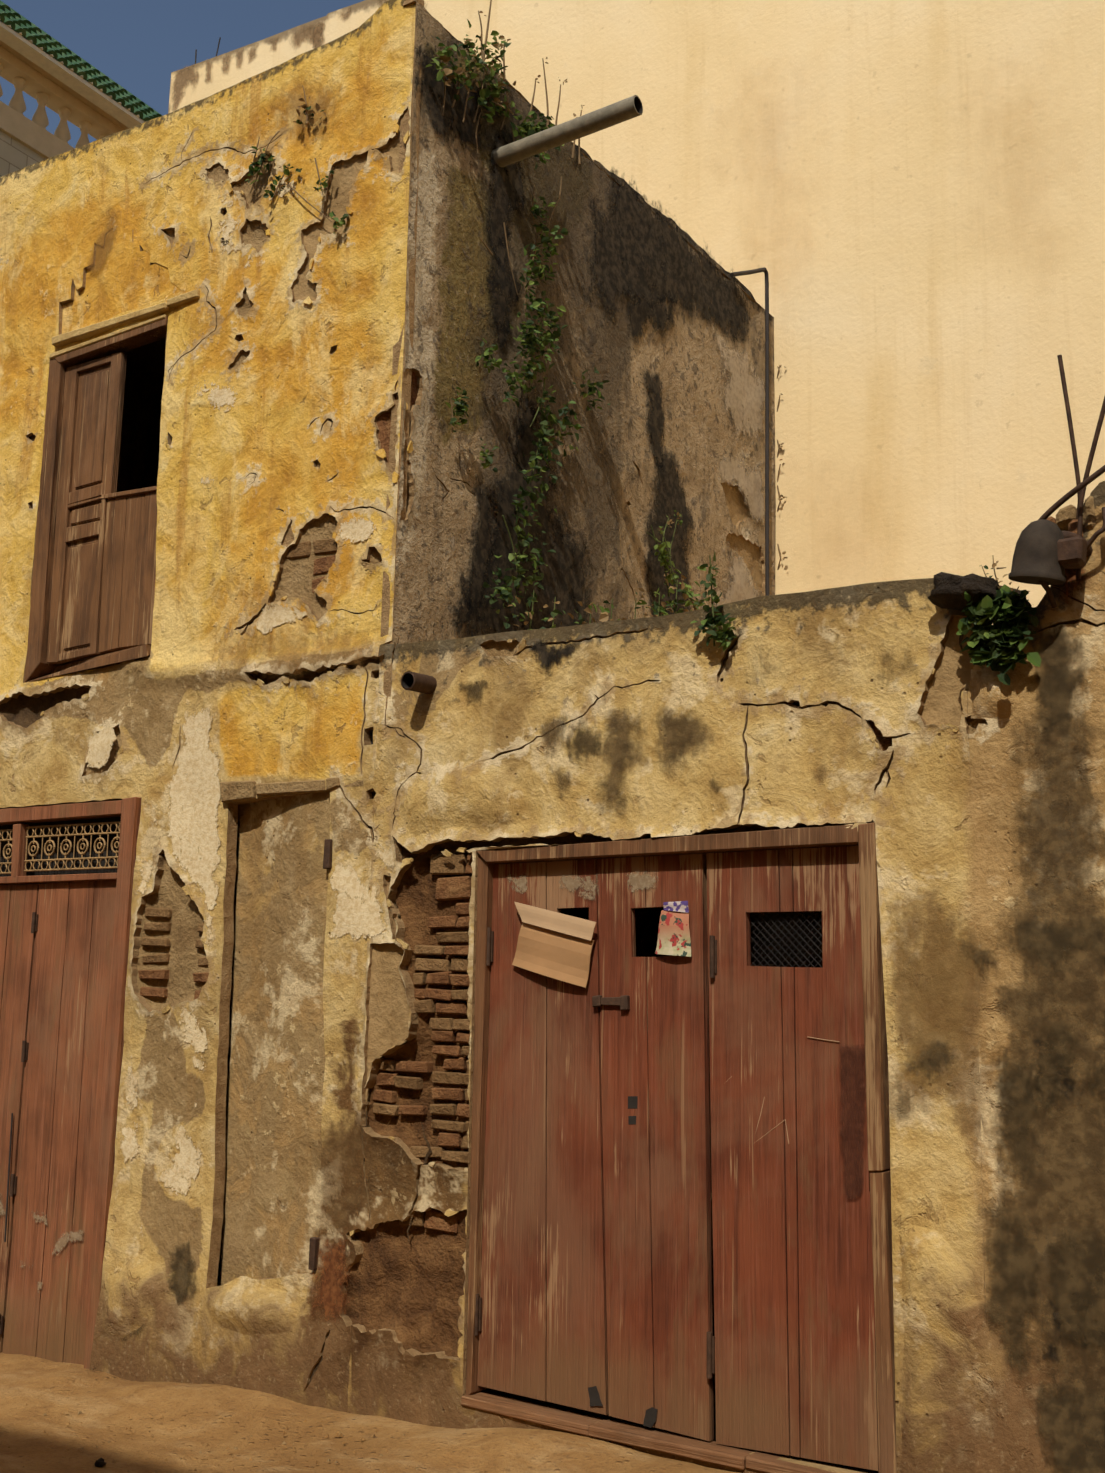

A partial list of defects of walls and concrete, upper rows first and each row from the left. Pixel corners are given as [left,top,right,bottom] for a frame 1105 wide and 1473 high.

flaking render [207,155,310,267]
flaking render [293,122,410,305]
water stain [587,169,765,526]
flaking render [256,515,382,634]
water stain [644,369,694,617]
flaking render [0,687,91,728]
peeling [85,727,123,776]
crack [719,639,908,829]
flaking render [137,708,222,1072]
flaking render [329,831,613,1171]
water stain [895,903,996,1132]
water stain [986,629,1105,1473]